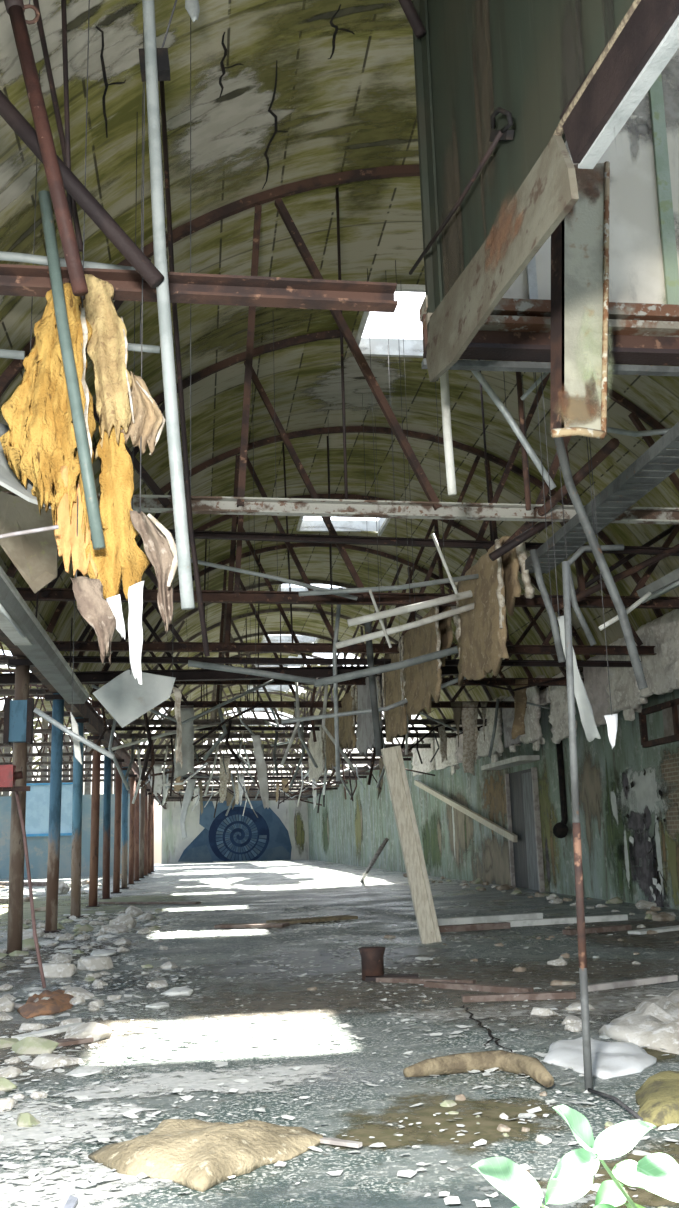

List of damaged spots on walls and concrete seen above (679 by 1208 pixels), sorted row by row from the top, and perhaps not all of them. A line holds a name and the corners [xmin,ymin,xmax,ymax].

peeling [0,0,175,94]
crack [95,26,126,138]
peeling [166,66,294,174]
crack [219,32,244,98]
crack [262,60,288,189]
crack [328,4,355,59]
leakage [421,793,519,888]
leakage [579,751,603,856]
flaking render [611,747,679,907]
crack [463,1005,513,1052]